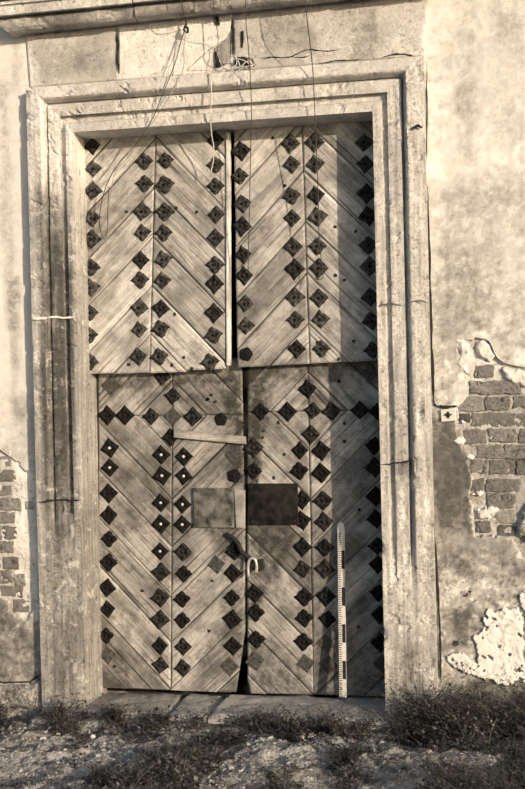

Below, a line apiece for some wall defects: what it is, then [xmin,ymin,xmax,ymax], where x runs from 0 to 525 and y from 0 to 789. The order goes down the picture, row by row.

crack [113,28,121,71]
crack [228,19,236,56]
crack [265,49,359,64]
crack [412,73,428,156]
crack [378,186,458,409]
peeling [391,382,399,447]
peeling [415,385,425,441]
flaking render [456,337,525,558]
flaking render [0,448,39,619]
peeling [397,478,409,543]
crack [434,525,442,681]
peeling [442,590,525,687]